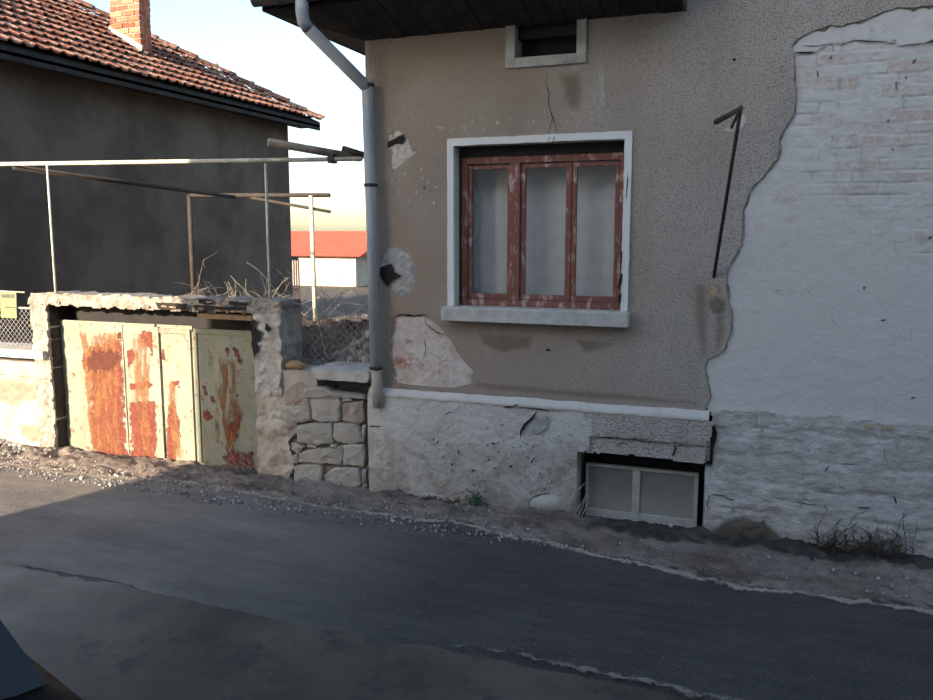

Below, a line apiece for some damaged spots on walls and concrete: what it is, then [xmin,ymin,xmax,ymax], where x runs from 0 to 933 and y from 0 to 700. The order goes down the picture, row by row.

spalling [387,129,422,193]
crack [546,77,557,146]
flaking render [704,5,933,558]
rust [80,330,181,461]
rust [202,347,255,470]
flaking render [389,314,473,387]